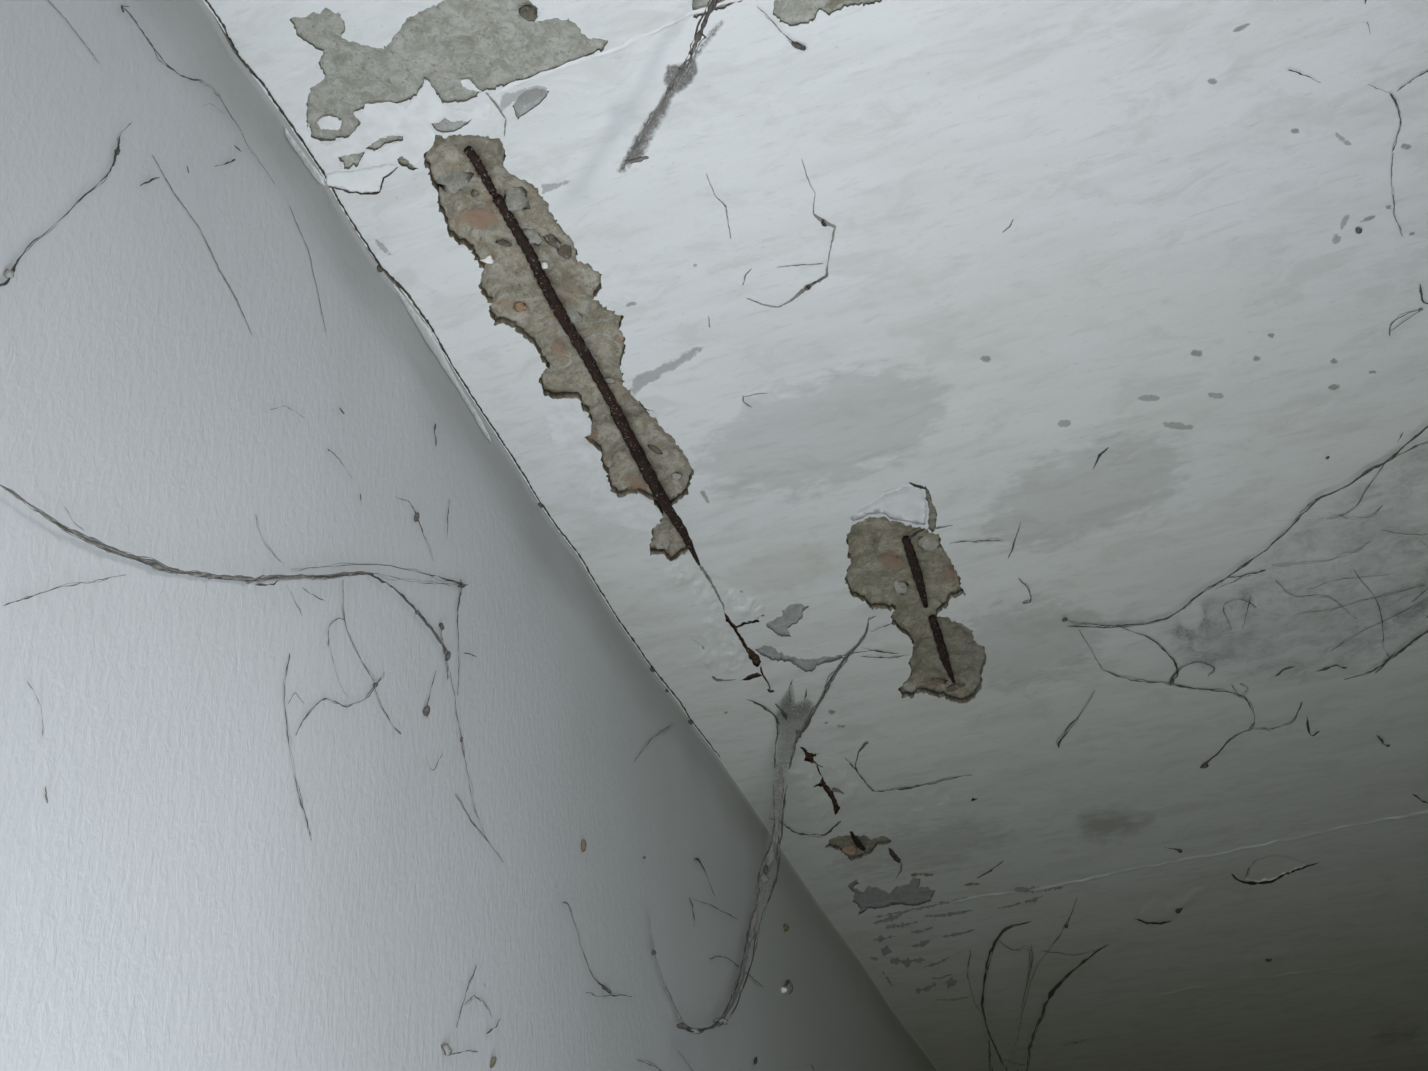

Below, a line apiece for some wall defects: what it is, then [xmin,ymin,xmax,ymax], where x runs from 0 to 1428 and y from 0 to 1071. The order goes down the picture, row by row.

peeling [773,0,882,26]
crack [152,155,252,334]
crack [706,173,731,239]
crack [743,159,836,308]
crack [205,0,720,757]
spalling [285,0,844,677]
crack [699,565,775,693]
spalling [845,486,986,704]
crack [800,747,844,815]
peeling [787,754,975,1001]